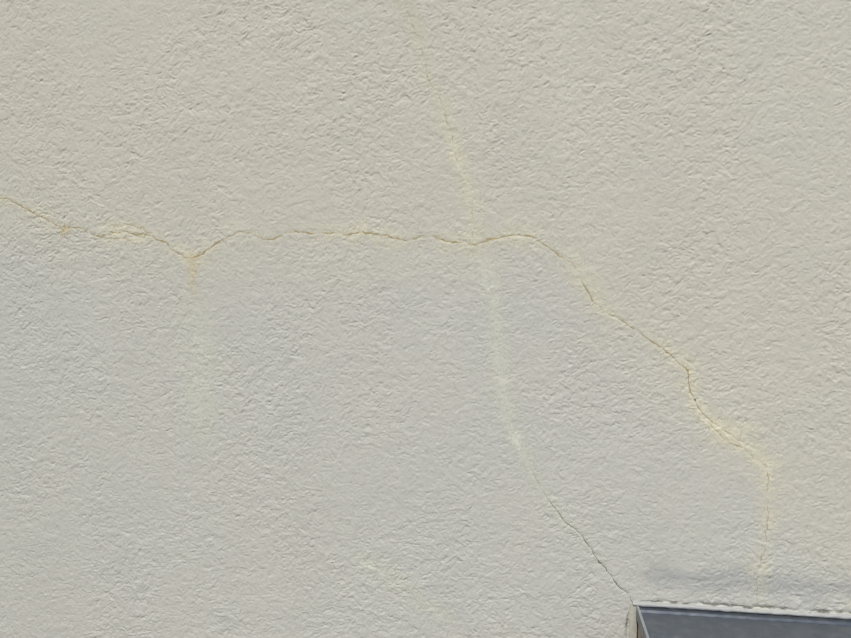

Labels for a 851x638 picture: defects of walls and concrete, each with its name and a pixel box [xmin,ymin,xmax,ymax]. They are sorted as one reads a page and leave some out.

crack [46,219,593,301]
crack [620,319,779,480]